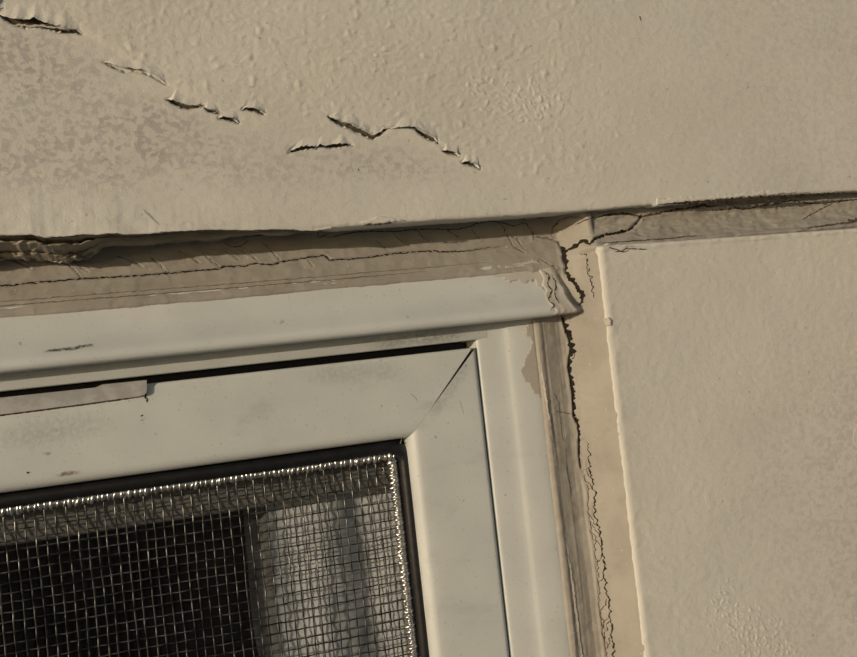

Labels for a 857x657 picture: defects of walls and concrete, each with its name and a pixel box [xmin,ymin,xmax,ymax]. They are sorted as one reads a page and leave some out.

peeling [0,0,84,36]
peeling [103,55,266,125]
peeling [288,112,481,170]
crack [0,192,857,657]